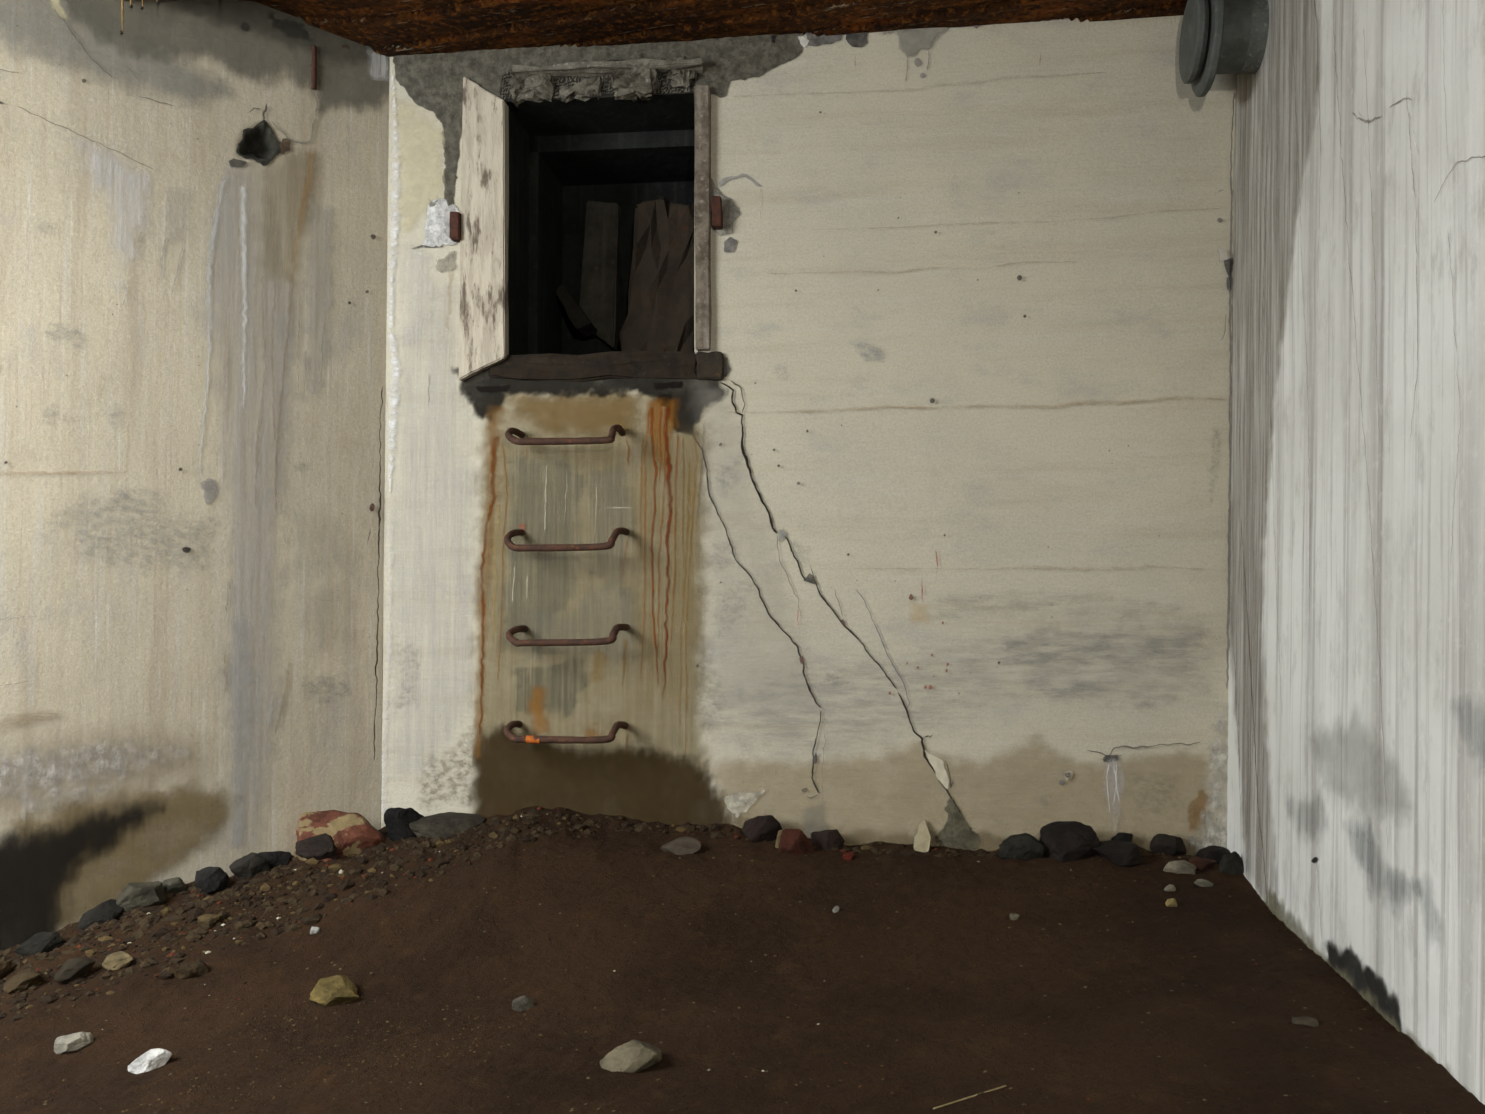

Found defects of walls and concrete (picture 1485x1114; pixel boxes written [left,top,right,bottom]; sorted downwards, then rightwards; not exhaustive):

spalling [51,0,949,206]
spalling [711,174,760,252]
water stain [199,176,291,764]
rust [479,438,524,729]
rust [622,400,697,720]
crack [693,381,980,851]
water stain [0,788,225,951]
rust [526,690,543,744]
water stain [474,726,765,827]
water stain [841,832,941,847]
water stain [974,835,1004,852]